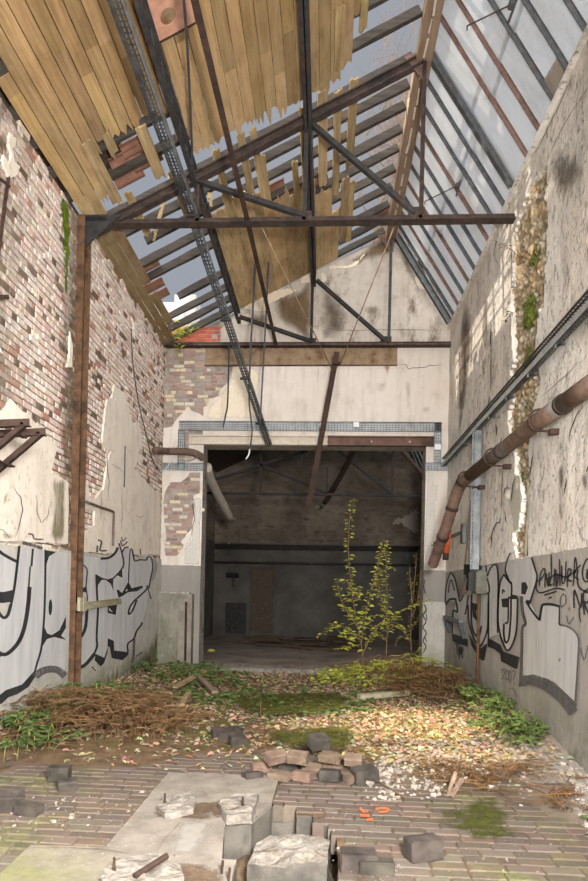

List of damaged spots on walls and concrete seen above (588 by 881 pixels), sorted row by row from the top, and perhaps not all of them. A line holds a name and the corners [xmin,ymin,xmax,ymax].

spalling [509,168,548,431]
spalling [164,327,259,426]
peeling [0,399,69,551]
peeling [84,385,205,564]
spalling [511,439,531,558]